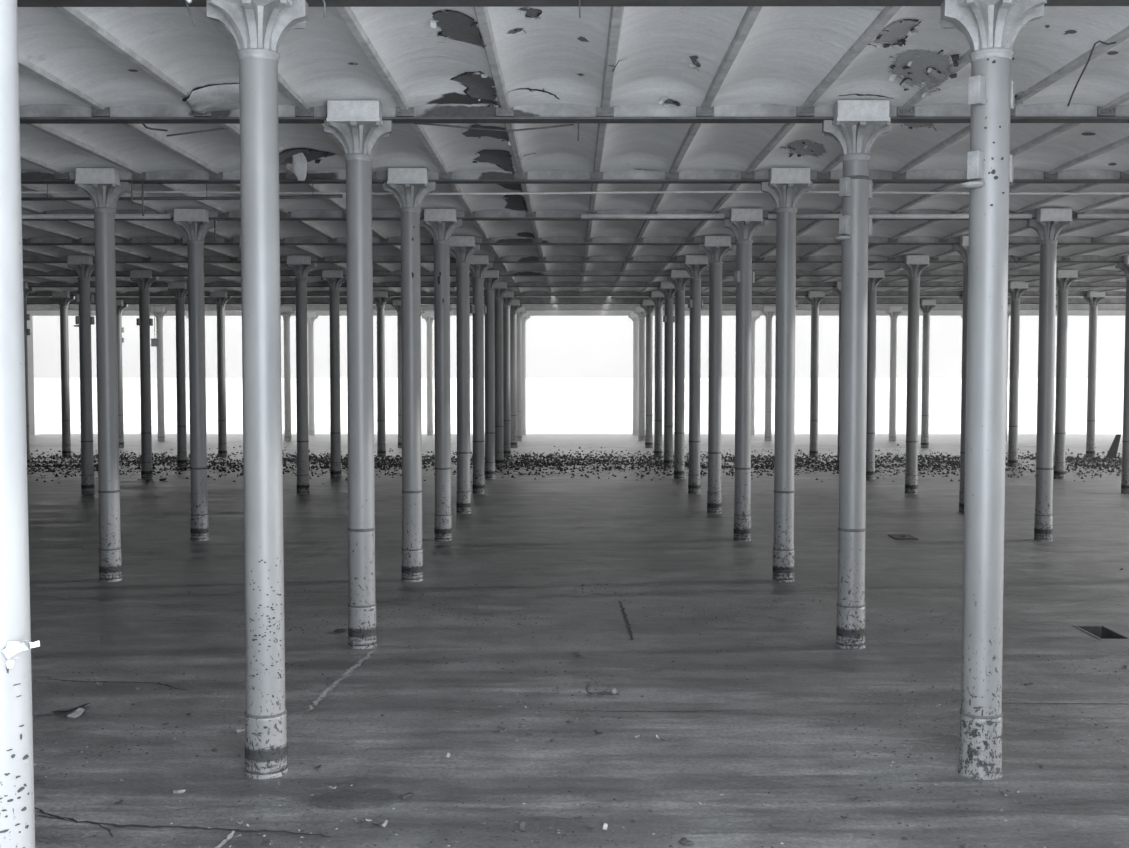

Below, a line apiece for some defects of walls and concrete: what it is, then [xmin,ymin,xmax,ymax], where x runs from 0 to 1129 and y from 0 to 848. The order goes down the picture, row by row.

peeling [430,10,486,48]
peeling [507,7,542,34]
peeling [868,19,959,98]
peeling [450,71,497,101]
flaking render [279,148,335,181]
peeling [462,124,527,211]
peeling [780,140,825,157]
peeling [2,641,40,697]
peeling [0,773,29,833]